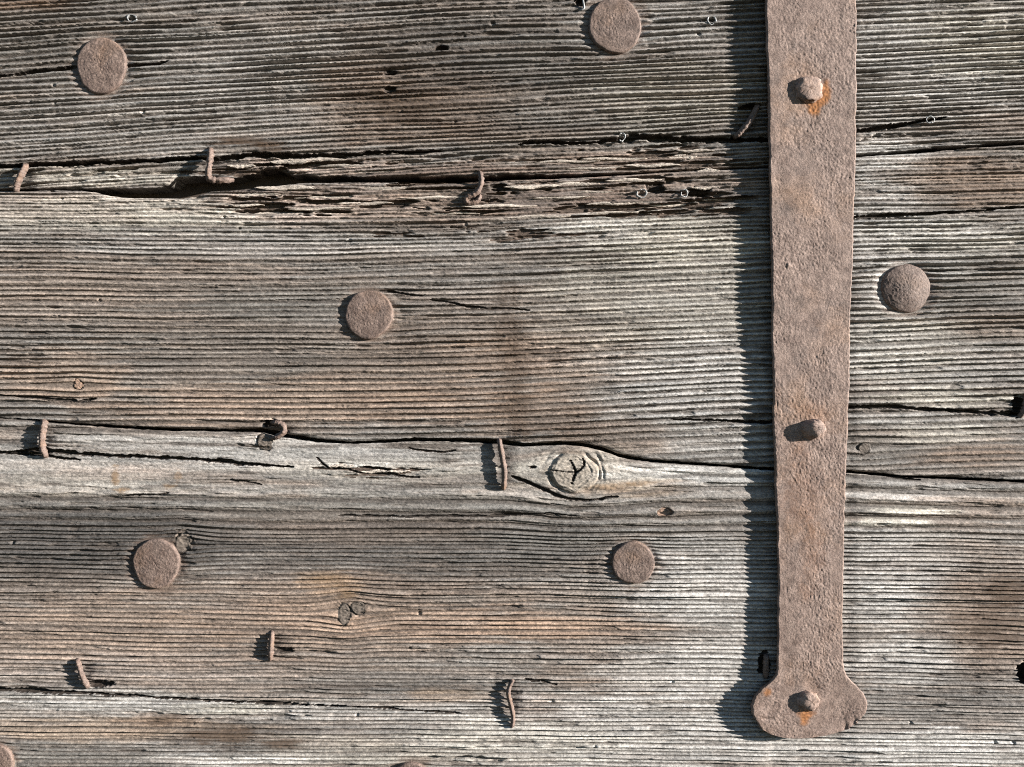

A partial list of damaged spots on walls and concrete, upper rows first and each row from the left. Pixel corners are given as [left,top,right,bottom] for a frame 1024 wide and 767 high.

rust [809,82,830,114]
crack [0,149,442,168]
crack [848,404,1013,416]
crack [671,417,772,425]
crack [0,447,456,485]
crack [886,474,921,482]